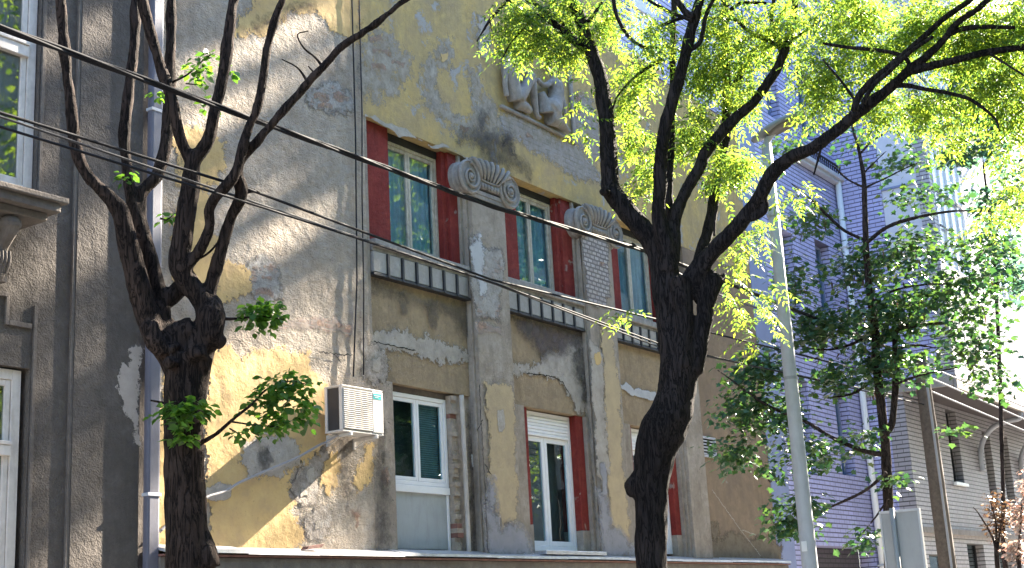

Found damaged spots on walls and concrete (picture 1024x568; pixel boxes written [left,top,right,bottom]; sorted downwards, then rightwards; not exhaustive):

peeling [234,0,601,184]
flaking render [115,344,145,449]
peeling [204,344,376,555]
spalling [360,324,469,387]
spalling [469,236,505,325]
peeling [482,232,631,539]